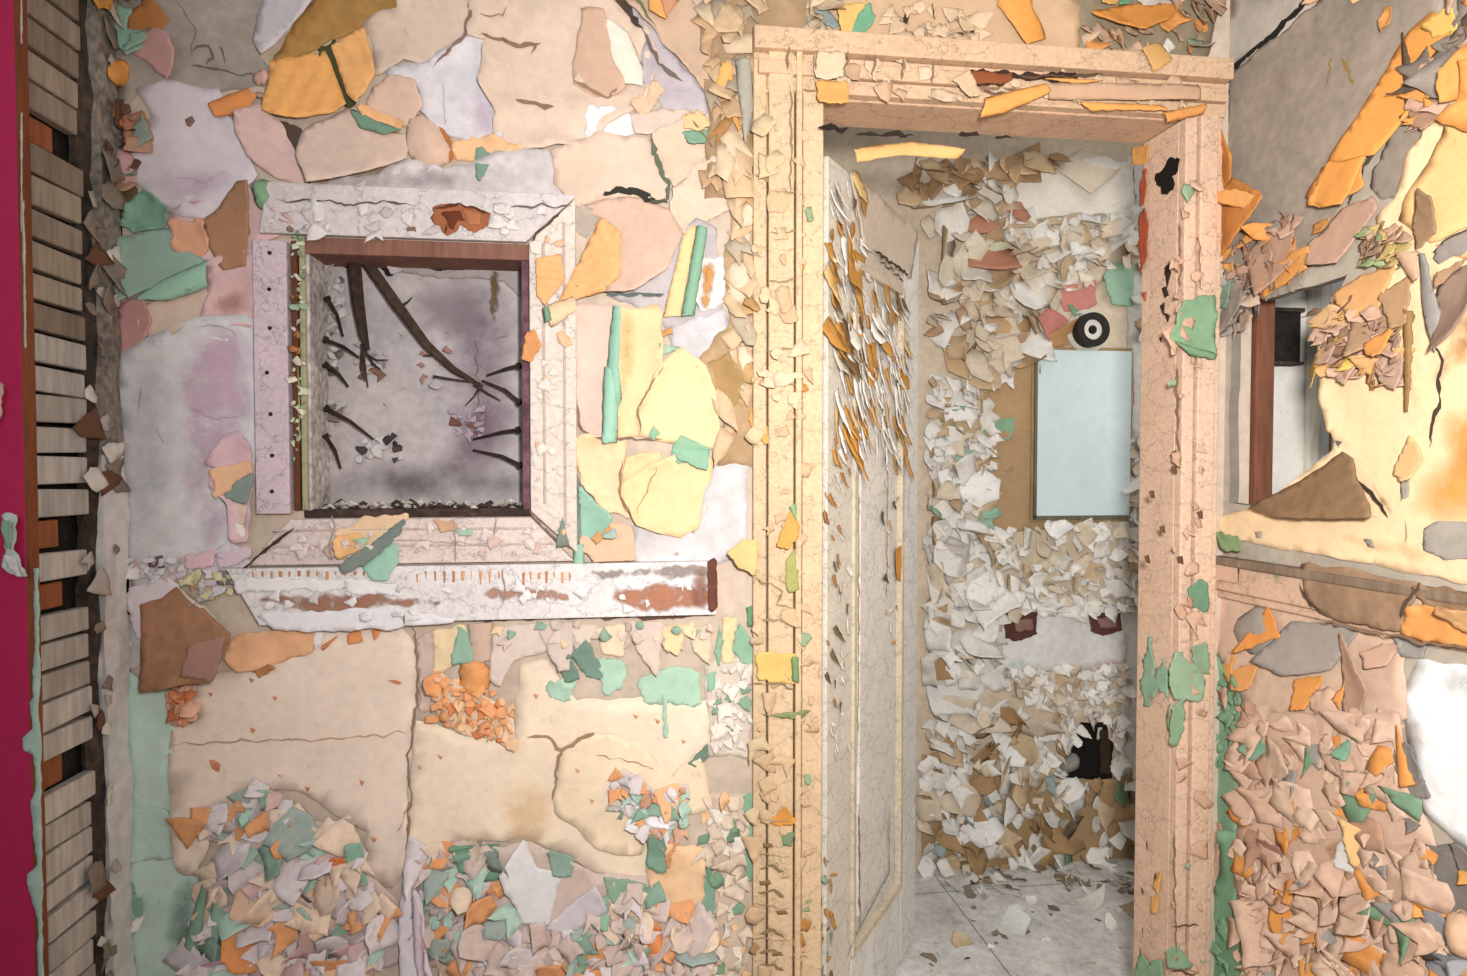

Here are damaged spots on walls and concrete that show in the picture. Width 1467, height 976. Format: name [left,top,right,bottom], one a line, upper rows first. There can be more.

crack [1228,0,1306,108]
crack [1435,229,1467,246]
peeling [521,329,558,399]
crack [1429,348,1444,447]
flaking render [73,385,131,496]
peeling [529,0,1467,976]
flaking render [79,551,112,595]
rust [694,558,718,613]
flaking render [91,675,113,735]
peeling [125,431,820,976]
flaking render [87,859,122,901]
flaking render [97,936,117,976]